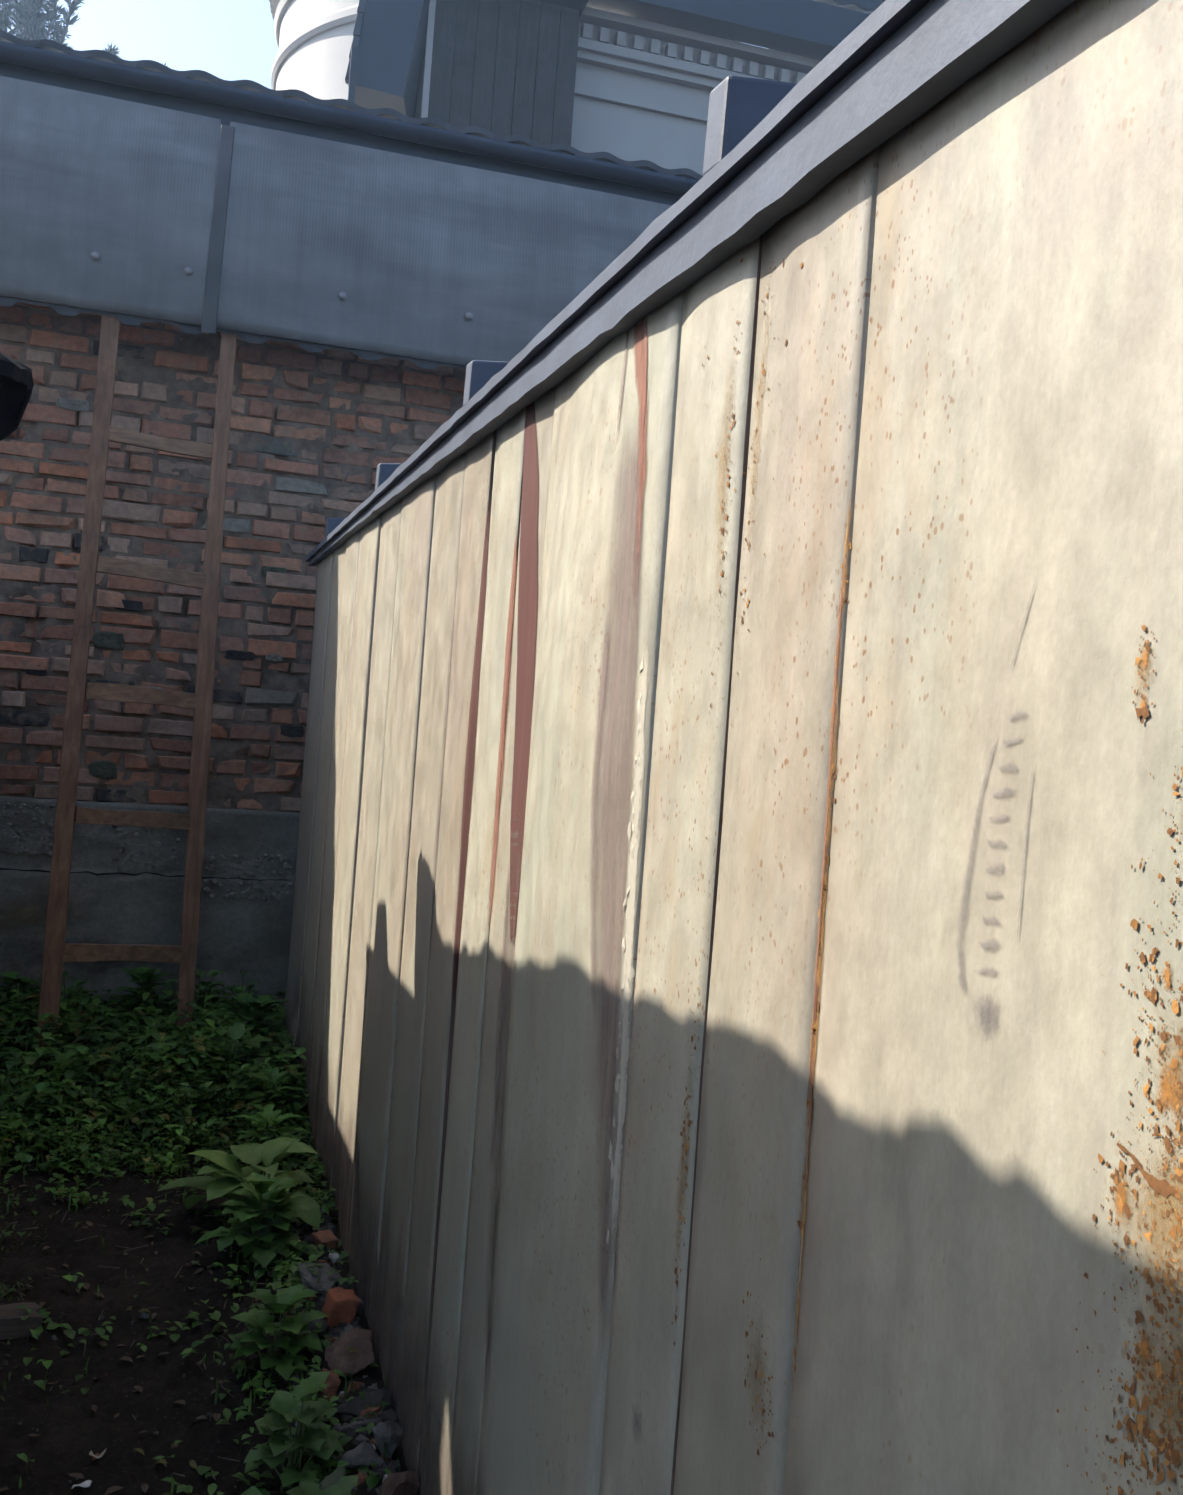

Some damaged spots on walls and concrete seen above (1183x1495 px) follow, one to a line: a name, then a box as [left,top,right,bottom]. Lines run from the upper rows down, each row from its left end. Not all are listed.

rust [452,506,490,993]
rust [489,535,517,915]
water stain [592,454,641,1118]
rust [741,513,851,1455]
rust [1067,766,1183,1495]
rust [1131,625,1155,724]